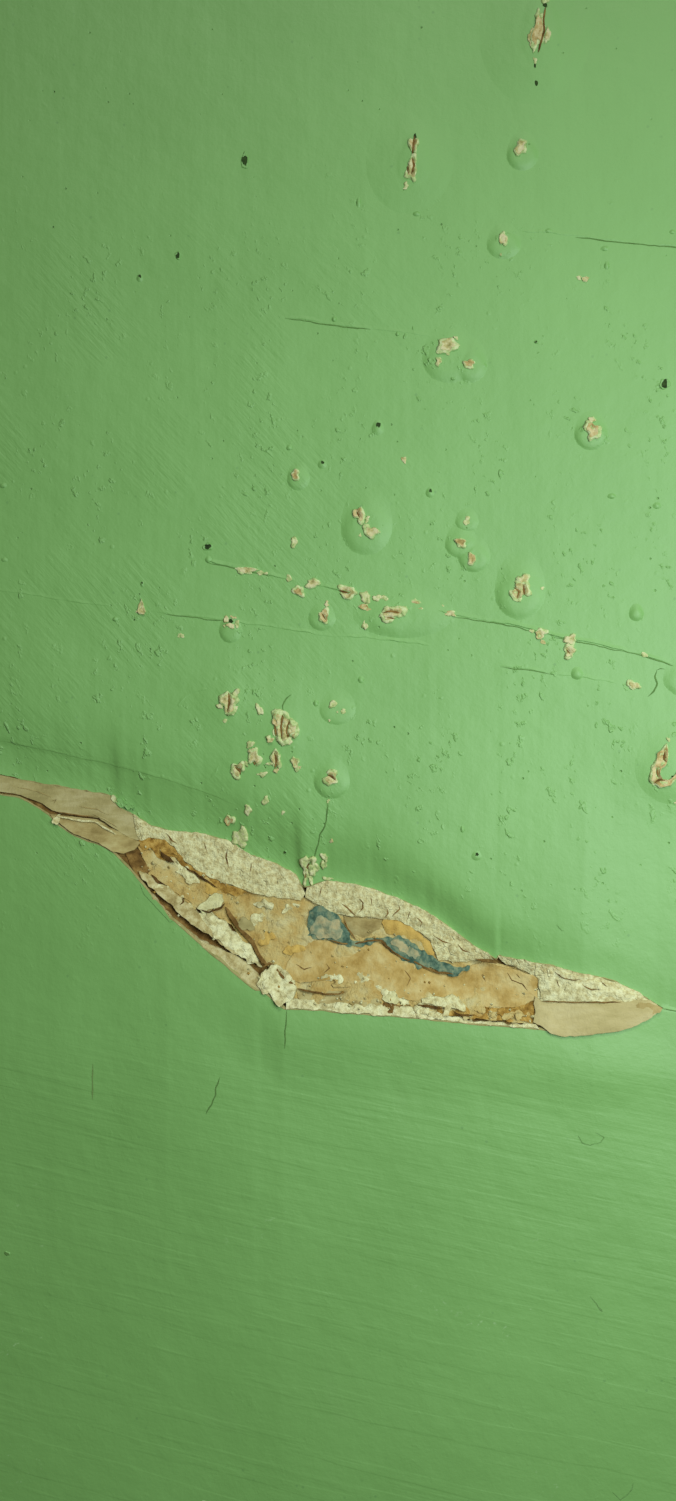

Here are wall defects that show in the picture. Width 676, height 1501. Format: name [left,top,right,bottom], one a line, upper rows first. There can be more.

crack [522,229,676,248]
crack [209,559,362,594]
crack [438,610,674,696]
spalling [216,688,302,780]
peeling [0,775,663,1037]